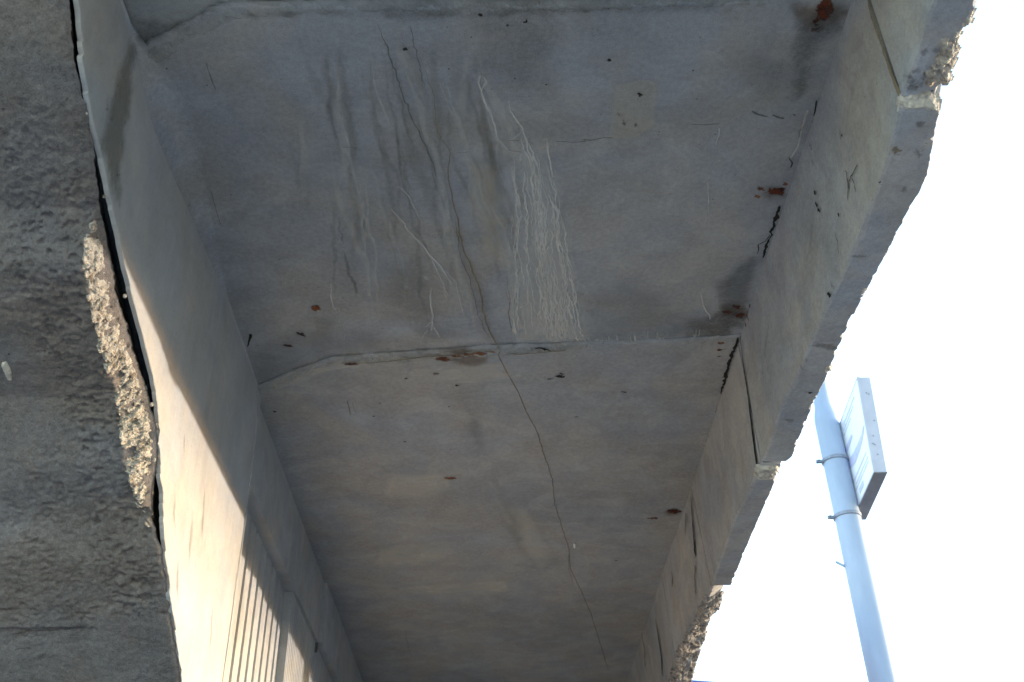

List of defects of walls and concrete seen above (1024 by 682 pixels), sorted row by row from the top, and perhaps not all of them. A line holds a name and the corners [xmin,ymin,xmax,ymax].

rust [811,0,834,32]
spalling [896,8,977,112]
crack [757,206,781,258]
rust [755,182,788,198]
spalling [82,220,159,527]
rust [344,351,495,375]
crack [381,31,607,665]
crack [715,338,757,464]
spalling [668,589,725,682]